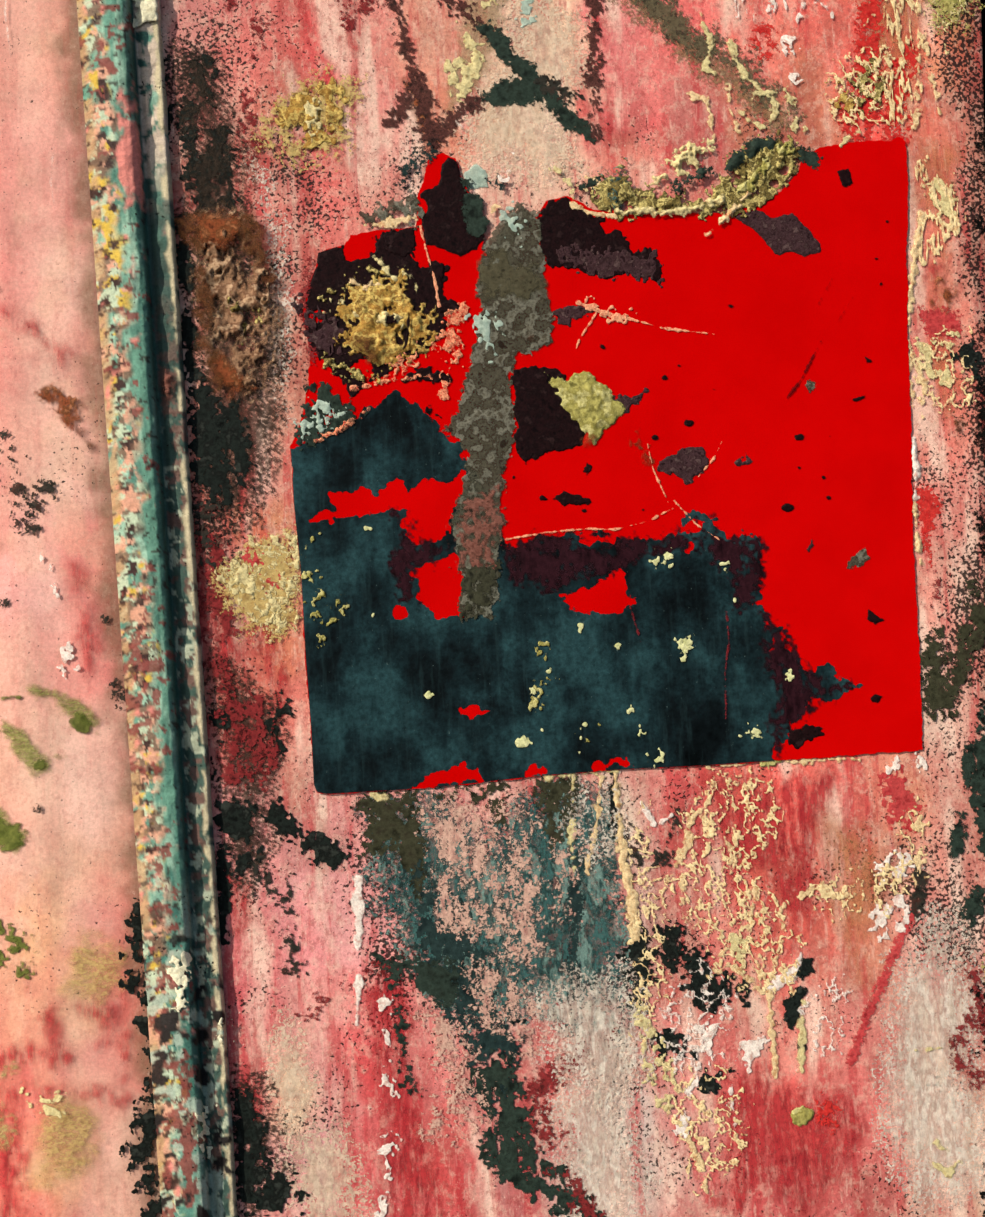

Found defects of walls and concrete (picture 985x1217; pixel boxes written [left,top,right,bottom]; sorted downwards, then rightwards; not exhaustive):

peeling [133,0,159,28]
peeling [734,0,834,55]
peeling [537,13,823,288]
corrosion [180,212,276,283]
corrosion [193,266,241,391]
peeling [195,141,930,1217]
peeling [167,951,192,1012]
peeling [112,898,163,1217]